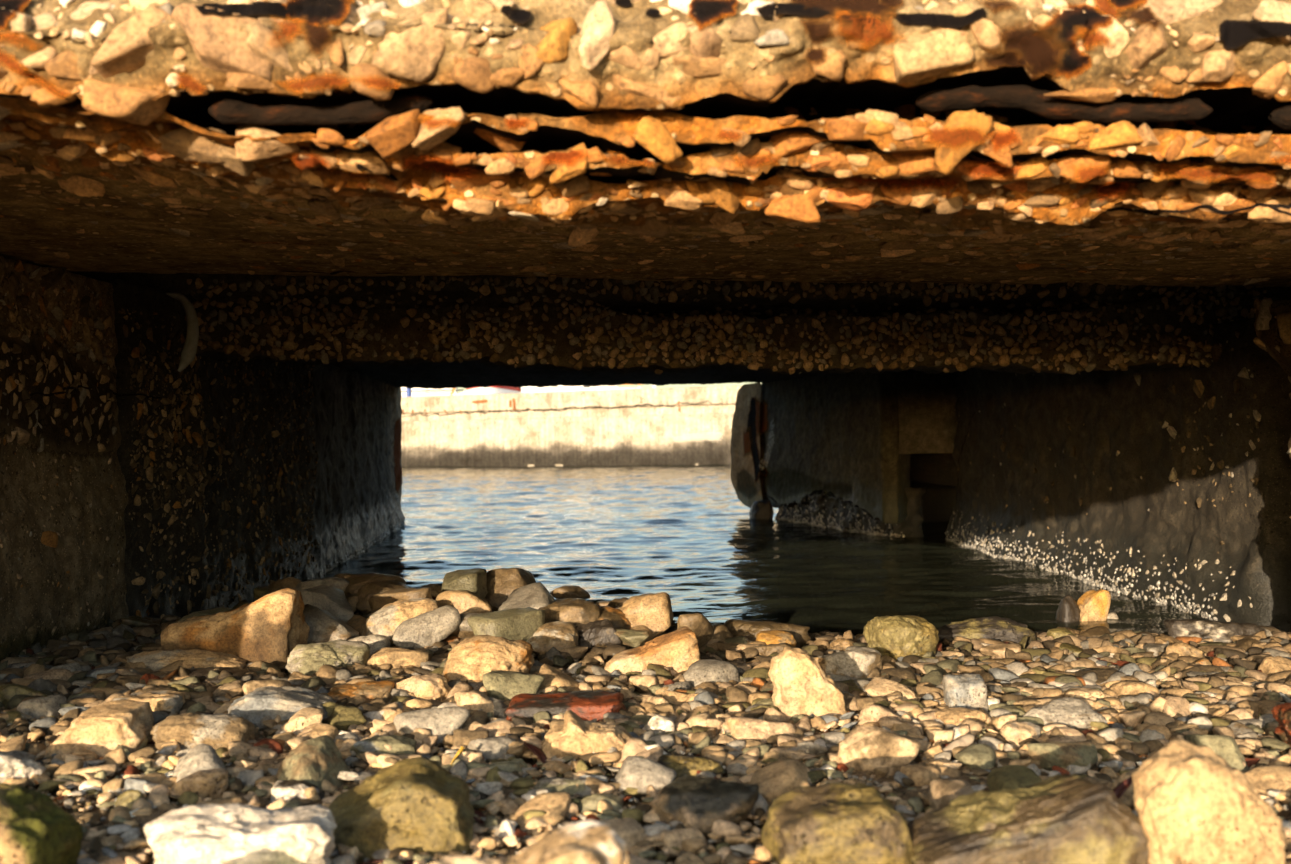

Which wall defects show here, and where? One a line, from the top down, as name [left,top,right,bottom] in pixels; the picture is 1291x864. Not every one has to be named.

rust [0,0,69,97]
rust [268,0,352,58]
rust [687,0,738,30]
rust [755,0,904,64]
rust [976,0,1160,79]
rust [293,154,376,181]
rust [401,155,475,180]
rust [606,150,654,167]
spalling [0,85,1291,223]
rust [826,127,1020,190]
rust [1074,165,1133,199]
rust [1156,156,1291,185]